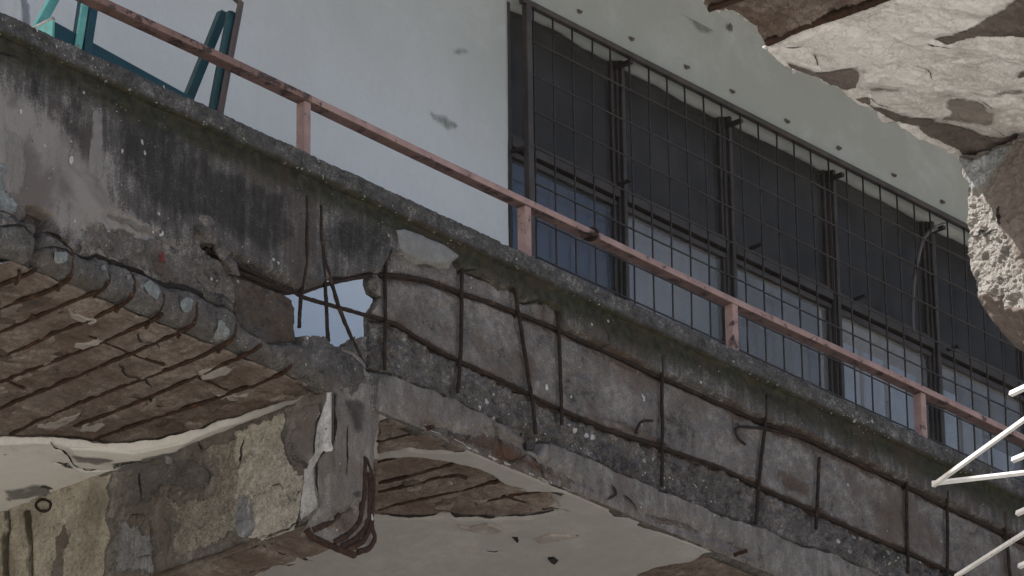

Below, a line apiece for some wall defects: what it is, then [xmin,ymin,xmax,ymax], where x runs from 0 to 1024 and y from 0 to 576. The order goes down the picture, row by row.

spalling [704,0,890,50]
peeling [935,0,1024,45]
water stain [87,109,103,180]
peeling [788,64,1024,276]
spalling [0,163,1024,576]